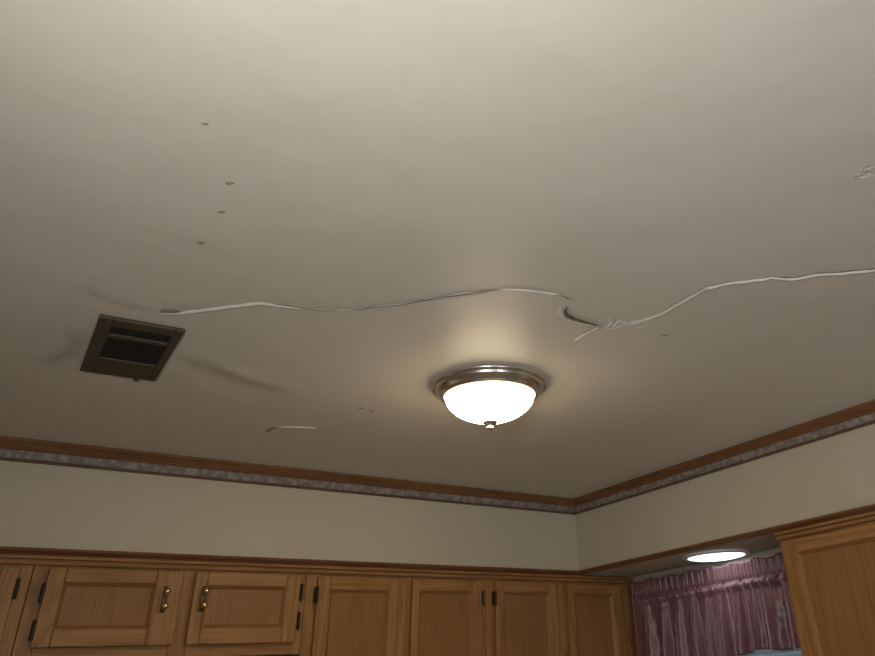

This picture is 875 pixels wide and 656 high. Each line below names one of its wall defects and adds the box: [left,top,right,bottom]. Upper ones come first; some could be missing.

crack [178,288,599,341]
crack [630,268,875,325]
crack [266,425,316,433]